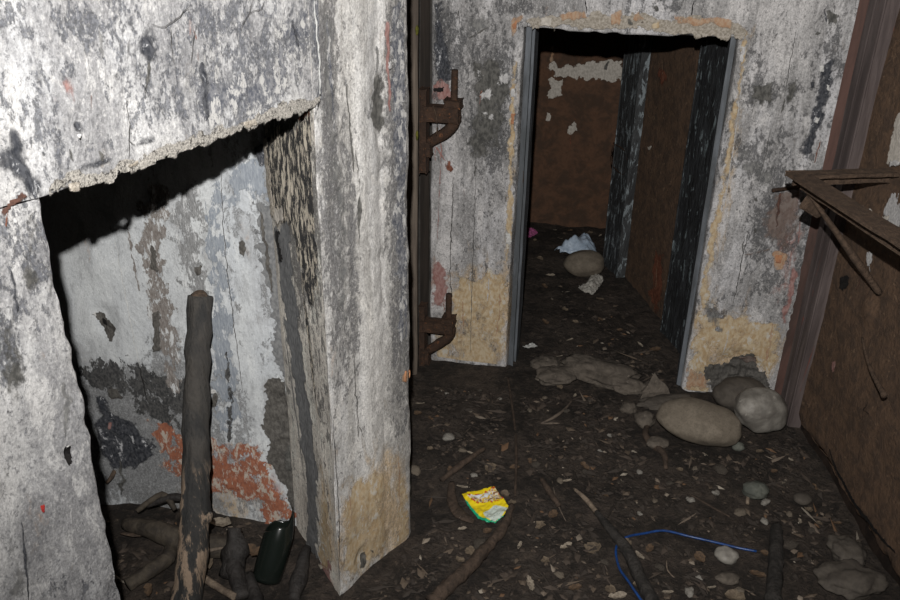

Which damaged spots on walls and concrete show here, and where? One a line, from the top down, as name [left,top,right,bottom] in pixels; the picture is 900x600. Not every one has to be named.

rust [433,80,451,100]
spalling [511,5,747,308]
peeling [49,97,331,582]
leakage [436,268,507,364]
leakage [686,302,780,392]
spalling [704,353,771,390]
leakage [318,457,409,573]